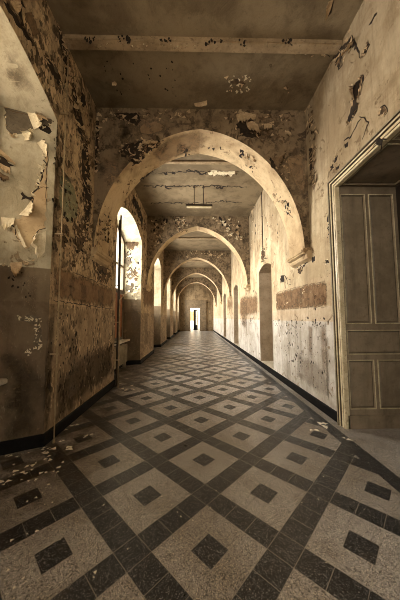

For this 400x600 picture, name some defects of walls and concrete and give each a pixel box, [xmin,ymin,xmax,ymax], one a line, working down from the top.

peeling [328,27,370,71]
peeling [224,75,251,94]
peeling [222,109,291,144]
peeling [329,75,369,171]
peeling [0,23,207,300]
leakage [53,243,112,309]
peeling [17,314,43,356]
leakage [44,318,112,422]